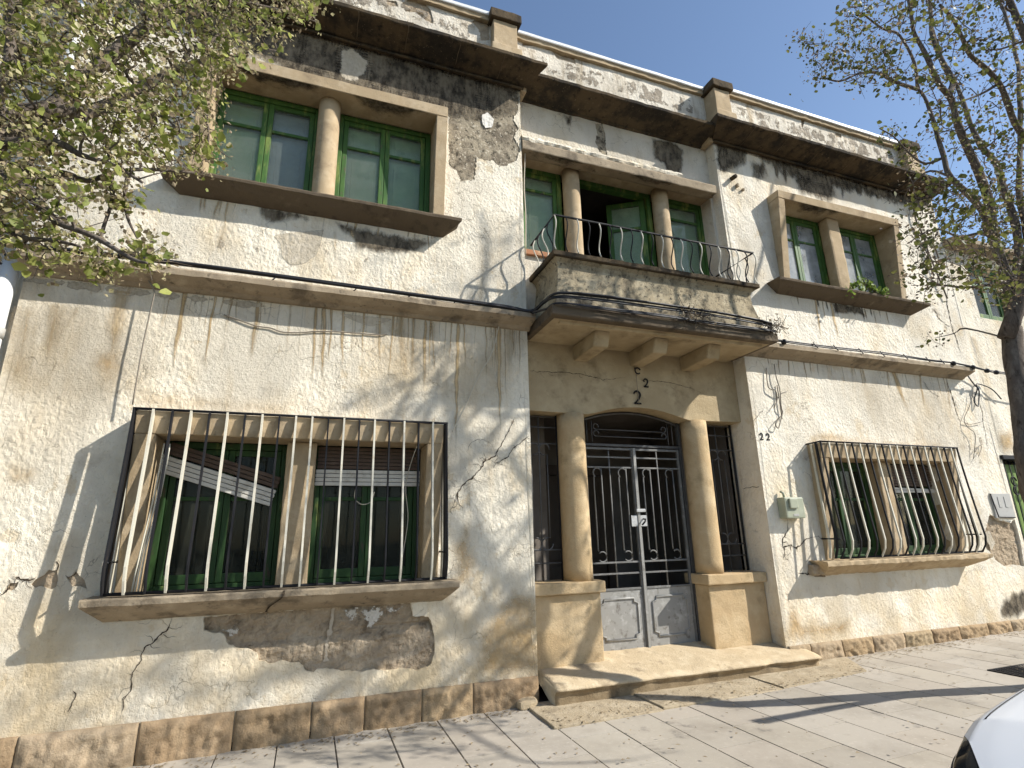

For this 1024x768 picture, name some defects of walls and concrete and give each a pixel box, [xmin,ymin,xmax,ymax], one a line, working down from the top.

peeling [448,97,522,181]
peeling [595,124,607,155]
damp [261,208,301,222]
damp [340,225,426,252]
crack [450,417,529,512]
spalling [984,516,1021,566]
crack [0,561,76,595]
spalling [31,570,87,589]
spalling [204,603,434,672]
crack [119,622,181,719]